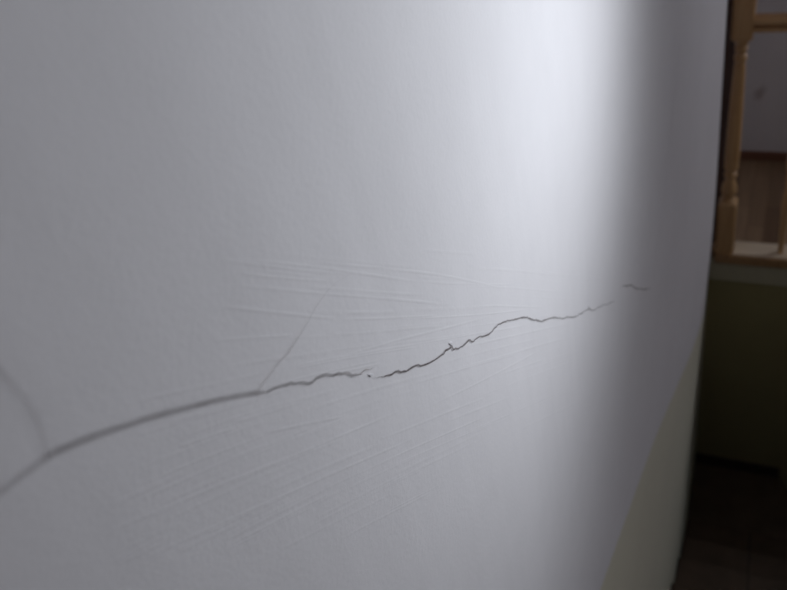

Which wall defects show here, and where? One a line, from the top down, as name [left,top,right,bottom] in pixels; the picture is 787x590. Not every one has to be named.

crack [368,306,590,378]